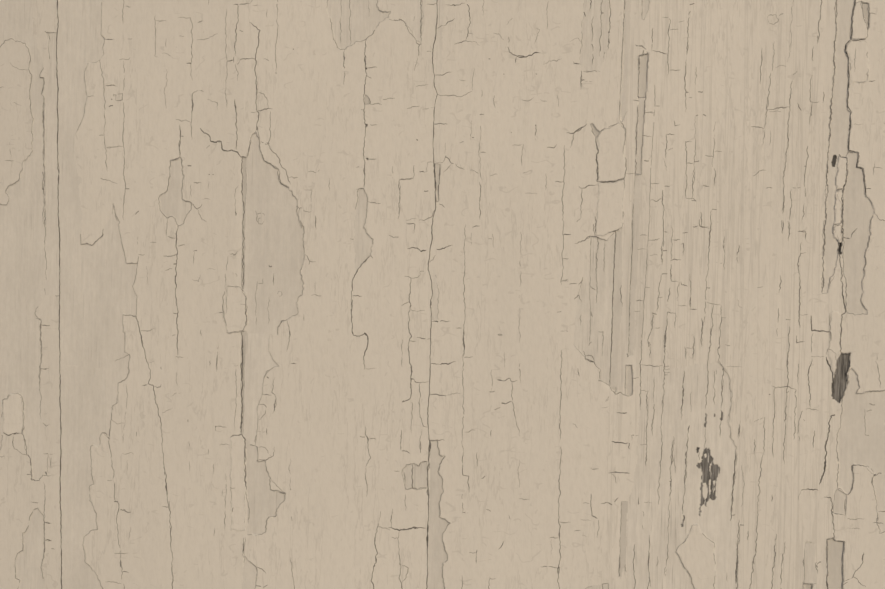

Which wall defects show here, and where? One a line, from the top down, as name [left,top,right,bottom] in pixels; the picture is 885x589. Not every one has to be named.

crack [0,0,62,589]
crack [88,58,139,246]
peeling [223,132,305,536]
peeling [580,0,611,73]
crack [340,0,885,589]
peeling [574,53,738,589]
peeling [821,0,875,376]
peeling [833,368,885,534]